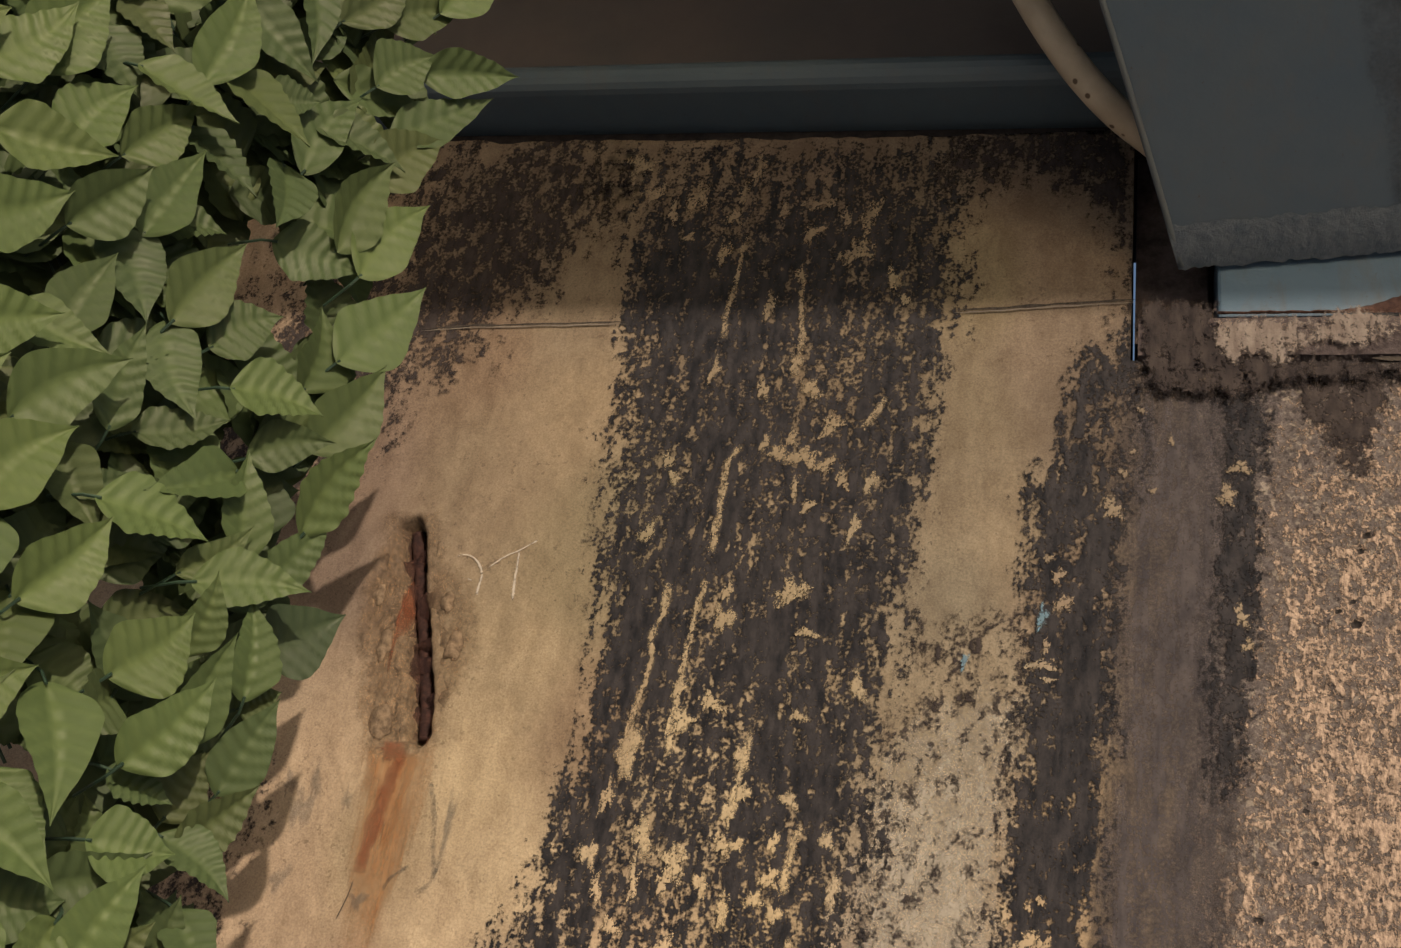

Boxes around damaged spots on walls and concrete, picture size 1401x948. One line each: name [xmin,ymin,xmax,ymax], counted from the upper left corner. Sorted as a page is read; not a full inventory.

damp [237,230,313,353]
damp [220,427,248,460]
damp [351,130,1401,948]
spalling [360,518,464,756]
damp [148,870,223,936]
damp [224,780,276,875]
corrosion [352,752,416,931]